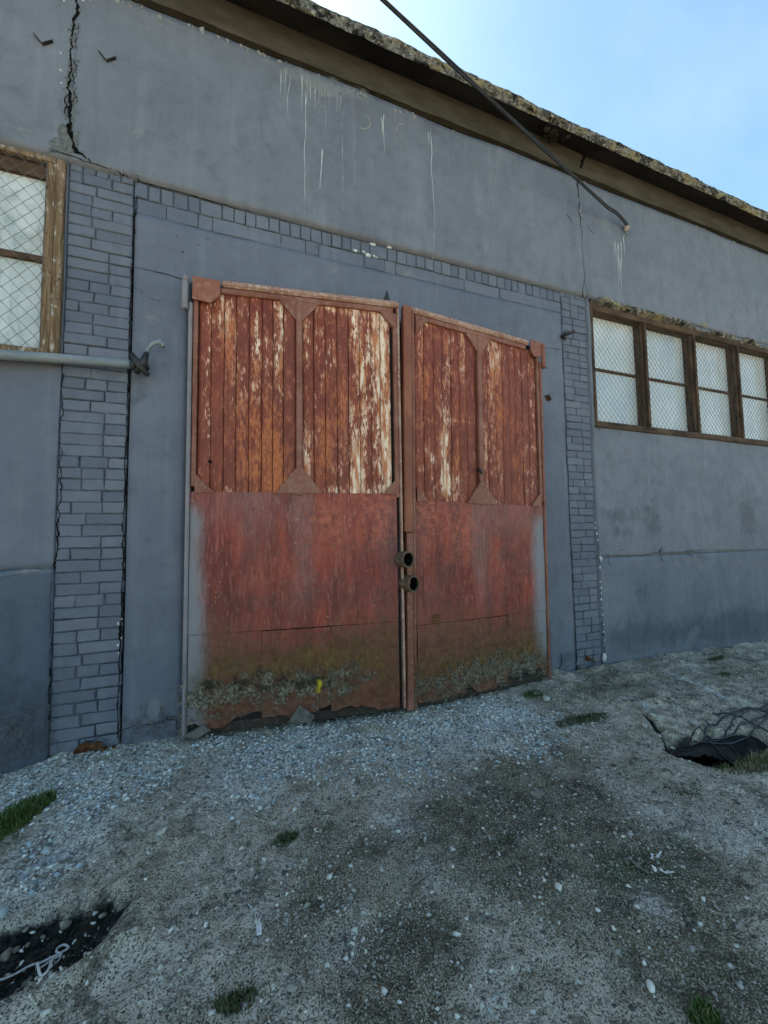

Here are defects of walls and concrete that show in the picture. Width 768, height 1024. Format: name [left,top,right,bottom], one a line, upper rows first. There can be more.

crack [49,0,412,743]
leakage [280,70,311,166]